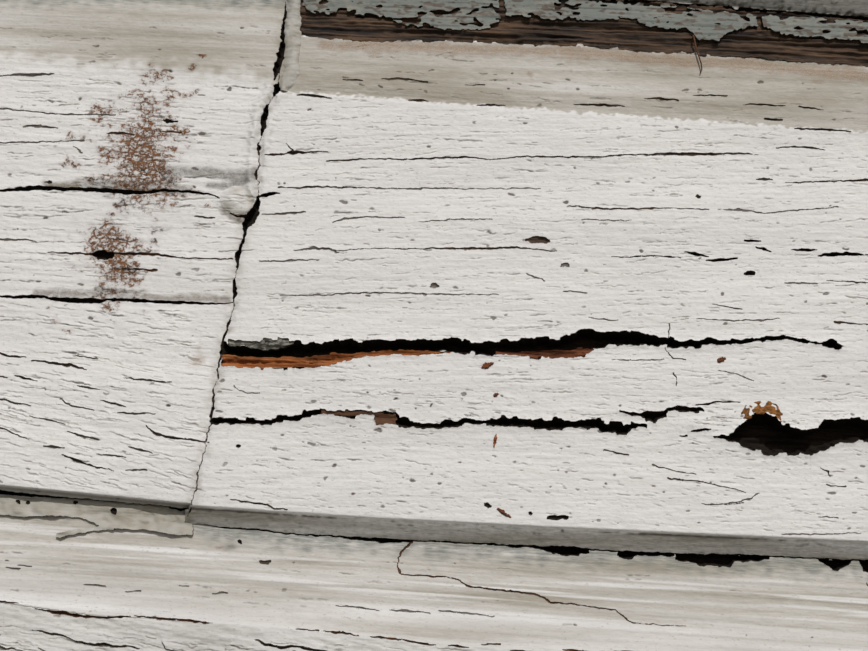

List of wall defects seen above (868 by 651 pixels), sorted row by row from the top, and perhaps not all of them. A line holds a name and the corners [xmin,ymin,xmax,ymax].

peeling [303,0,868,44]
crack [0,185,220,219]
corrosion [65,64,198,313]
crack [0,238,233,272]
crack [259,246,555,262]
crack [611,239,771,262]
crack [792,248,868,257]
crack [0,294,233,305]
crack [211,304,868,456]
crack [652,464,759,505]
crack [397,541,683,626]
crack [296,628,525,651]